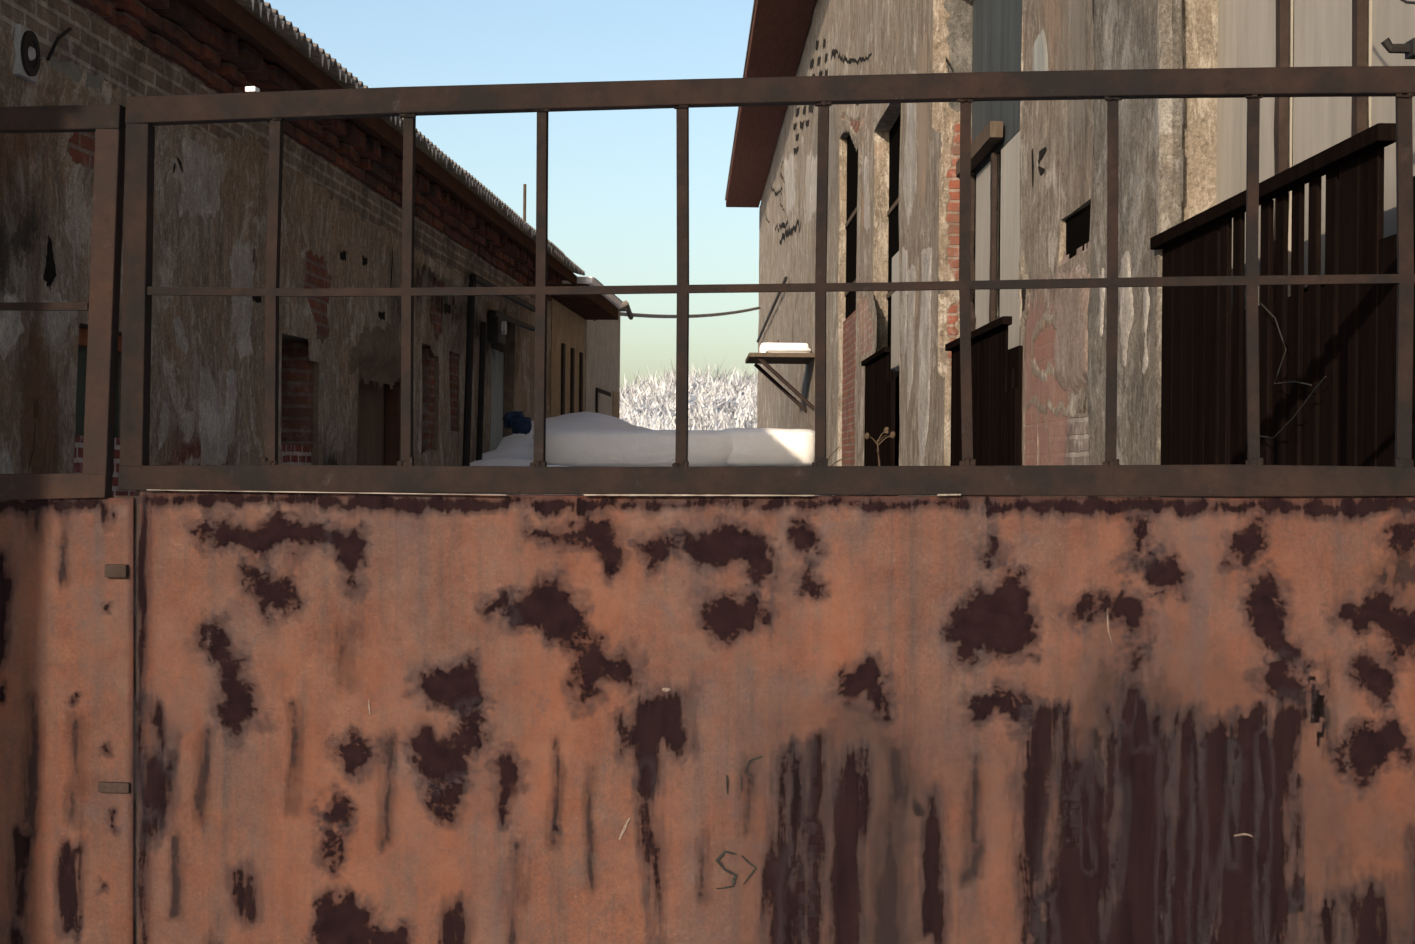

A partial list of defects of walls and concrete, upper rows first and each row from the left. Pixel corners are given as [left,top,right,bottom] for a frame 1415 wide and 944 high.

flaking render [0,0,256,107]
peeling [158,239,264,465]
flaking render [154,121,550,363]
flaking render [856,275,878,377]
flaking render [1018,251,1090,465]
peeling [1099,250,1150,375]
rust [189,507,367,622]
rust [524,515,777,645]
rust [333,654,491,848]
rust [478,575,695,914]
rust [966,515,1415,944]
rust [311,792,411,944]